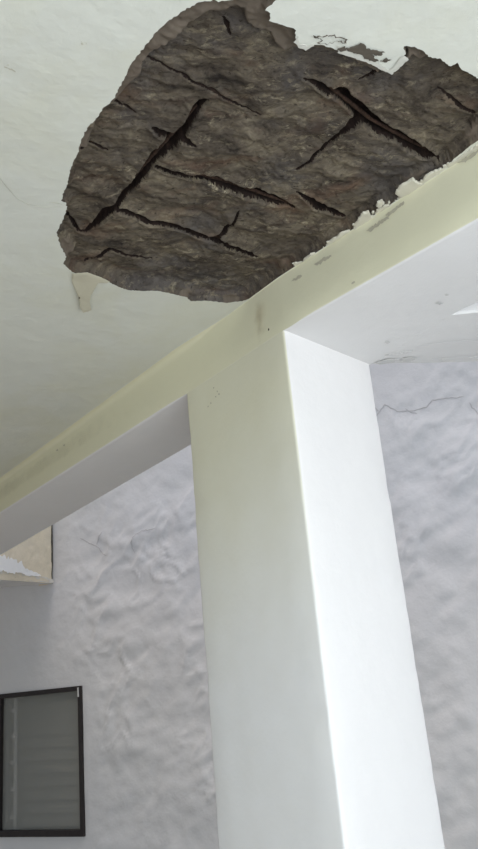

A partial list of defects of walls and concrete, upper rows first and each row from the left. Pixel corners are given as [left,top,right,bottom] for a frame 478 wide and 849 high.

spalling [56,0,478,313]
crack [375,396,478,416]